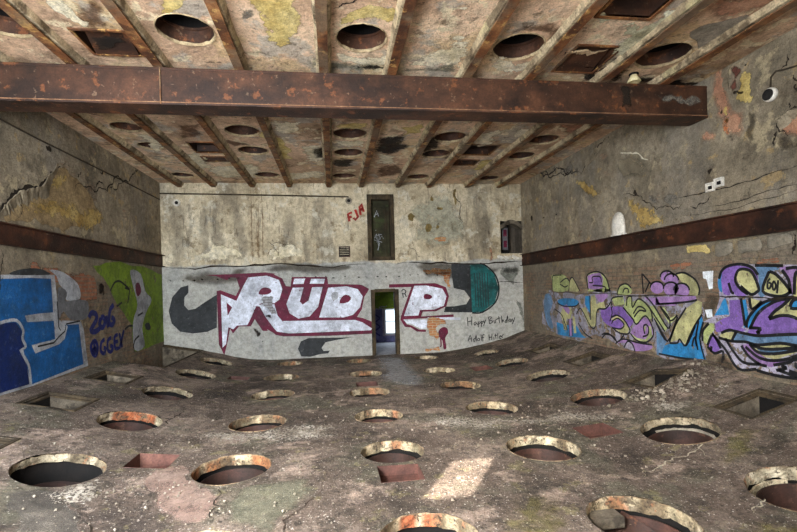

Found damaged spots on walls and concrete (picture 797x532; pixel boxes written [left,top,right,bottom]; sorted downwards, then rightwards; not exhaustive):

peeling [161,0,183,13]
peeling [242,0,301,48]
rust [662,95,700,105]
peeling [714,63,753,133]
flaking render [772,105,797,148]
flaking render [0,163,103,231]
crack [75,170,138,192]
crack [672,166,797,217]
rust [686,244,710,254]